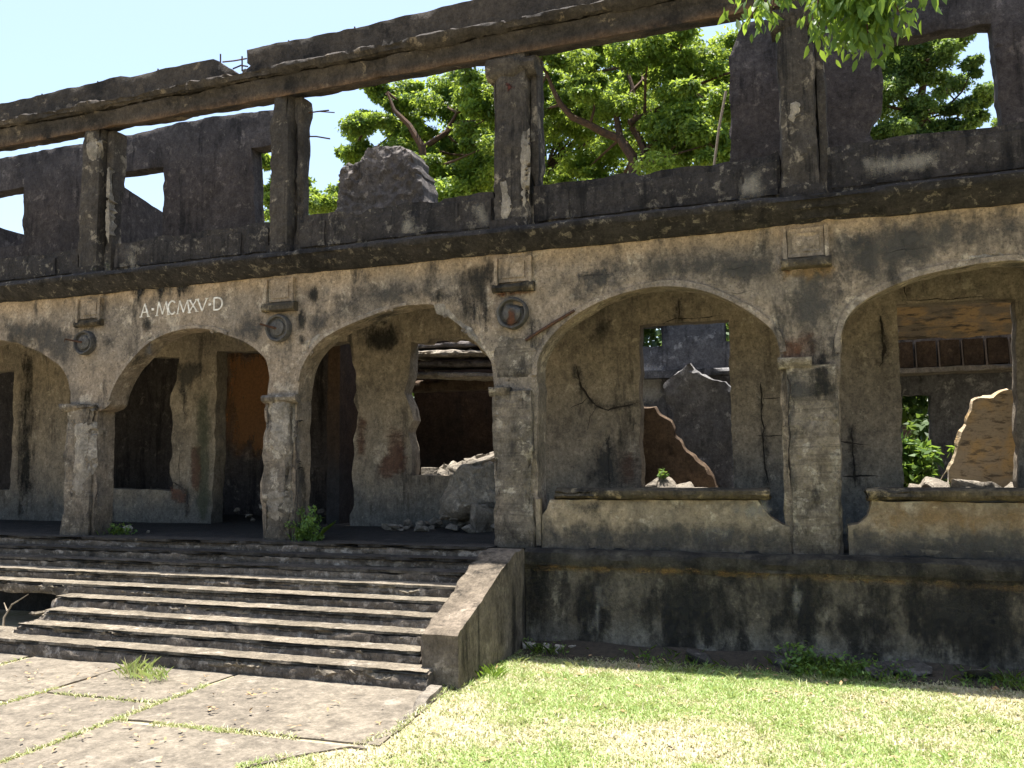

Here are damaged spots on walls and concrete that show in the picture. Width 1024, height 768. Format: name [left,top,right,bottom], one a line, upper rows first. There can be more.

flaking render [499,129,531,219]
leakage [364,325,398,350]
leakage [298,262,494,344]
crack [878,316,888,367]
leakage [5,321,72,491]
crack [571,365,638,483]
crack [758,376,796,491]
crack [841,426,885,487]
leakage [644,569,725,647]
leakage [862,580,1021,663]